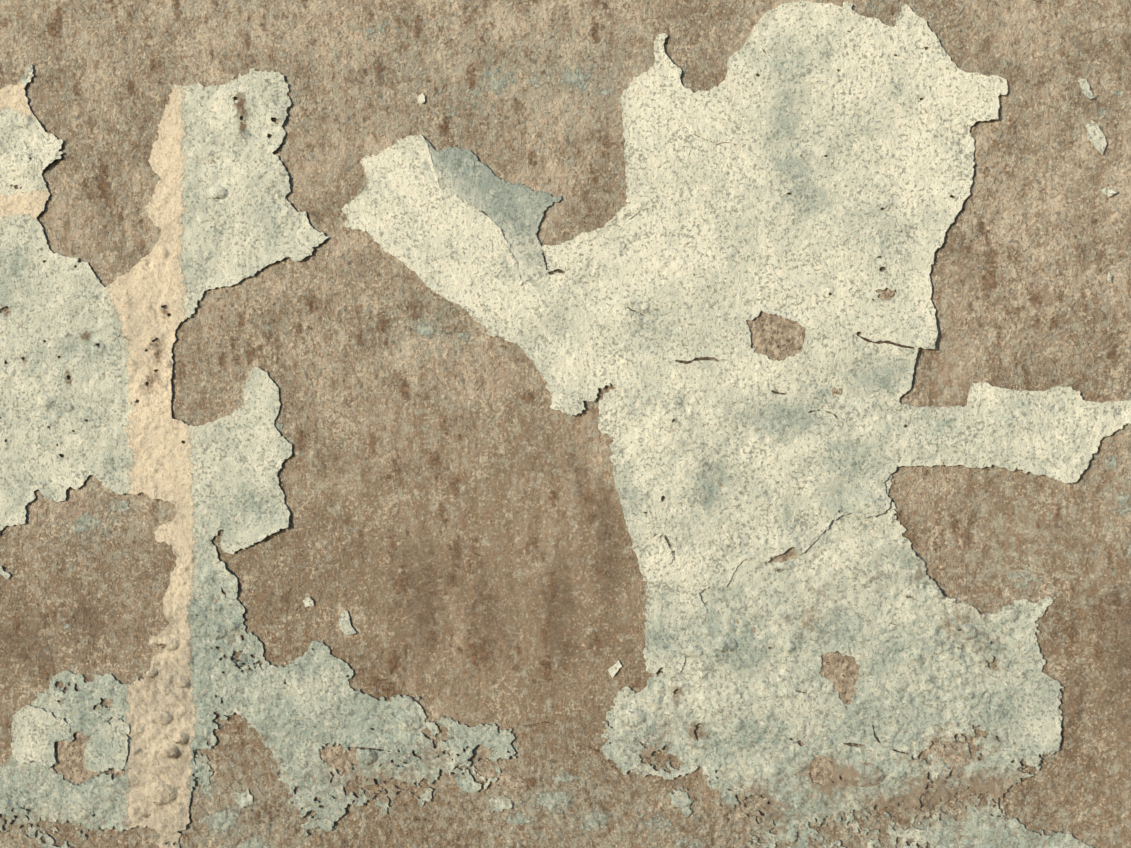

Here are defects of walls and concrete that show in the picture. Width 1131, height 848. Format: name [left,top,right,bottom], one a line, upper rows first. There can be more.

corrosion [47,7,62,48]
peeling [0,64,608,848]
peeling [342,0,1131,848]
crack [860,336,910,348]